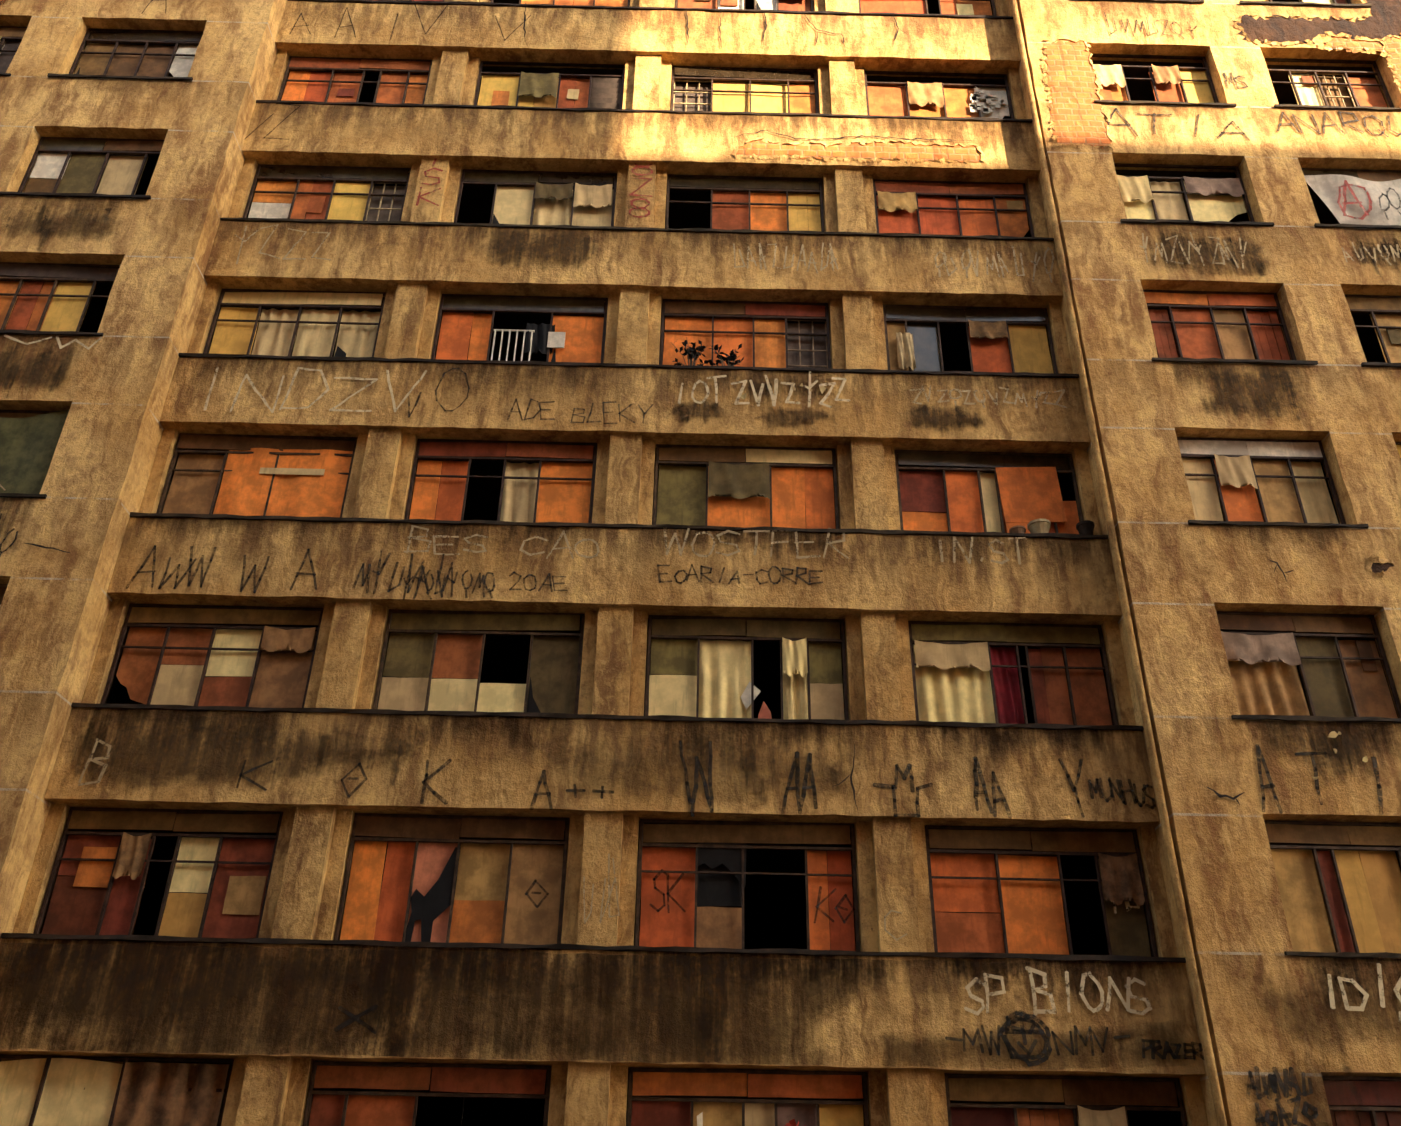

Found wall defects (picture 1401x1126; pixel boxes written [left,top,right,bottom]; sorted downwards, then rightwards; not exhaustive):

flaking render [1233,0,1401,87]
flaking render [1040,37,1114,151]
flaking render [731,137,985,164]
damp [33,939,243,956]
damp [325,945,561,962]